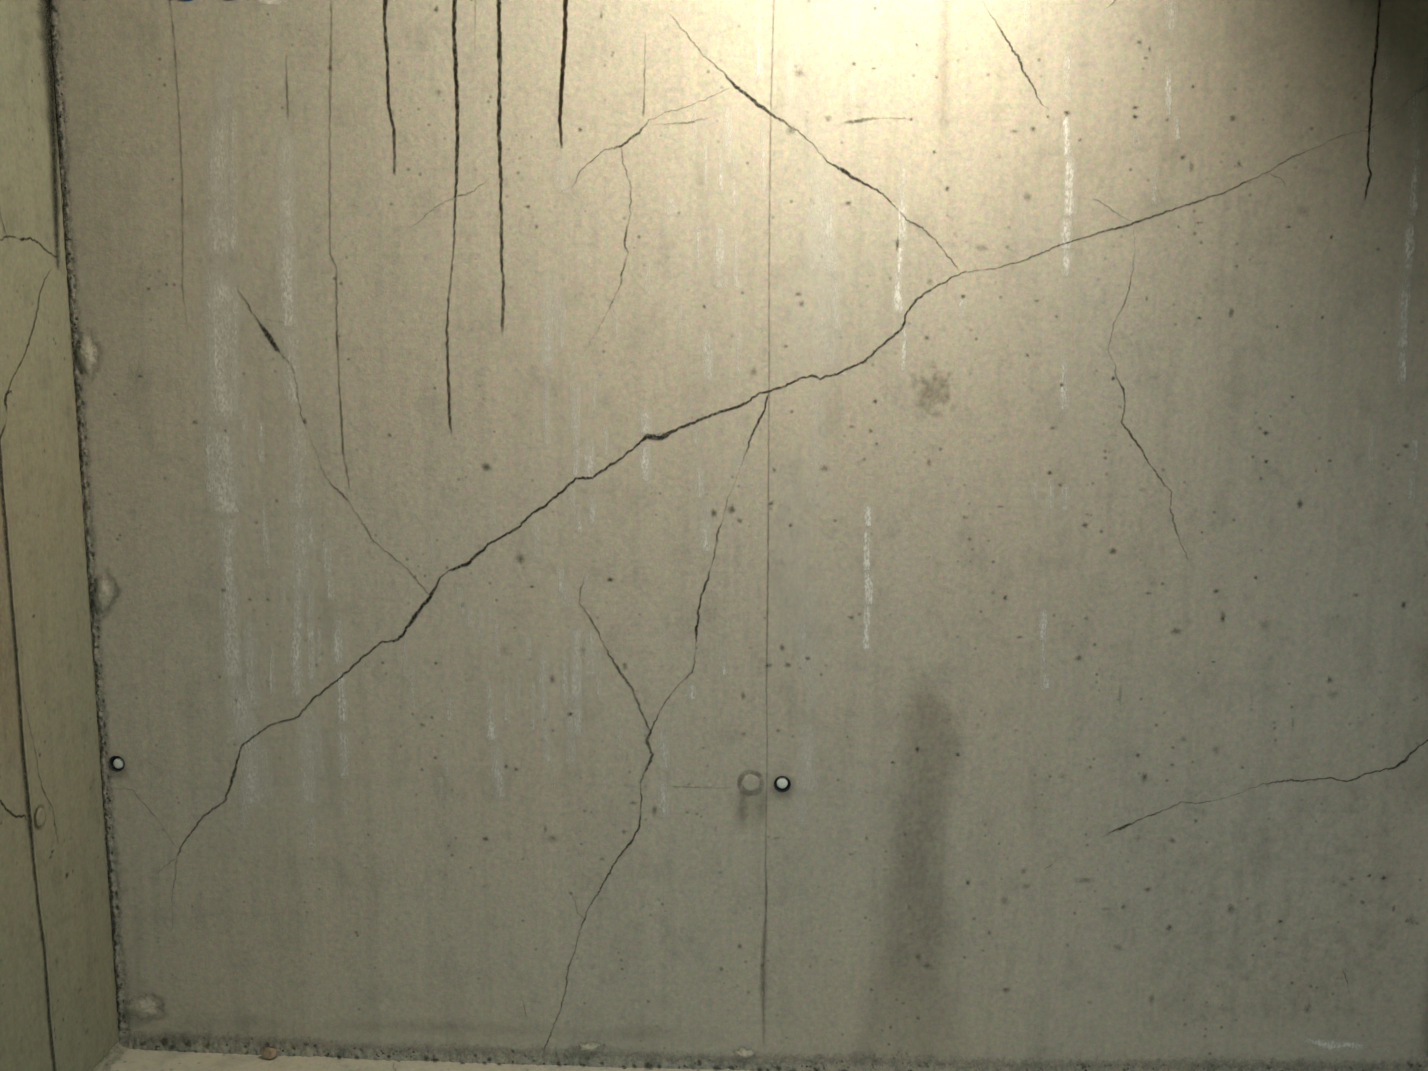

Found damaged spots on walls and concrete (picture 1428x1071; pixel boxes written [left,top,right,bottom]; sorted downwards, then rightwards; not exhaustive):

crack [1001,31,1037,94]
crack [725,74,927,232]
crack [1011,182,1245,264]
crack [1121,386,1162,480]
crack [179,257,964,853]
crack [584,619,669,921]
crack [1276,740,1428,782]